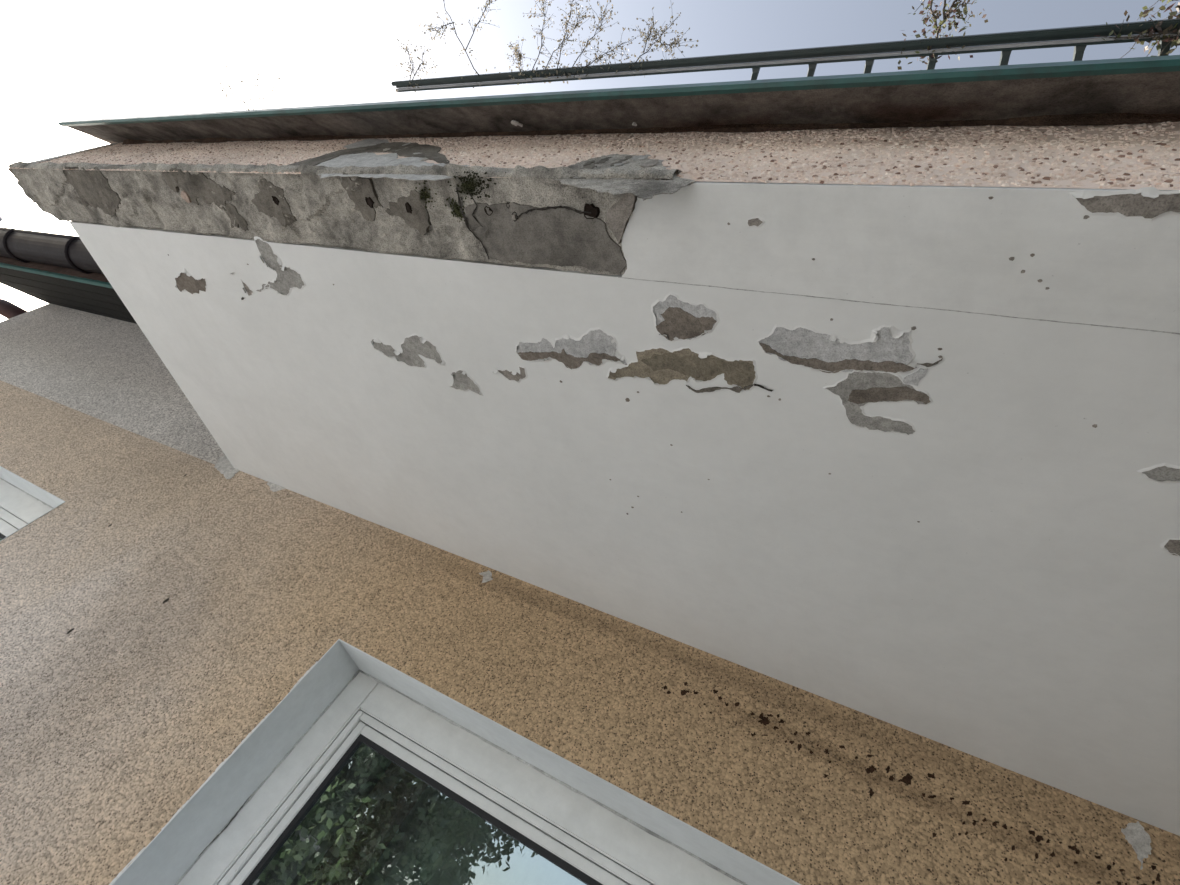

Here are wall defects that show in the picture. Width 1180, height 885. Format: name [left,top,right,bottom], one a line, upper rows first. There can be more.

spalling [9,139,696,301]
crack [456,187,489,259]
crack [516,206,591,220]
peeling [1068,187,1180,222]
peeling [371,333,483,396]
peeling [492,292,943,436]
peeling [1137,463,1180,484]
peeling [1160,538,1180,558]